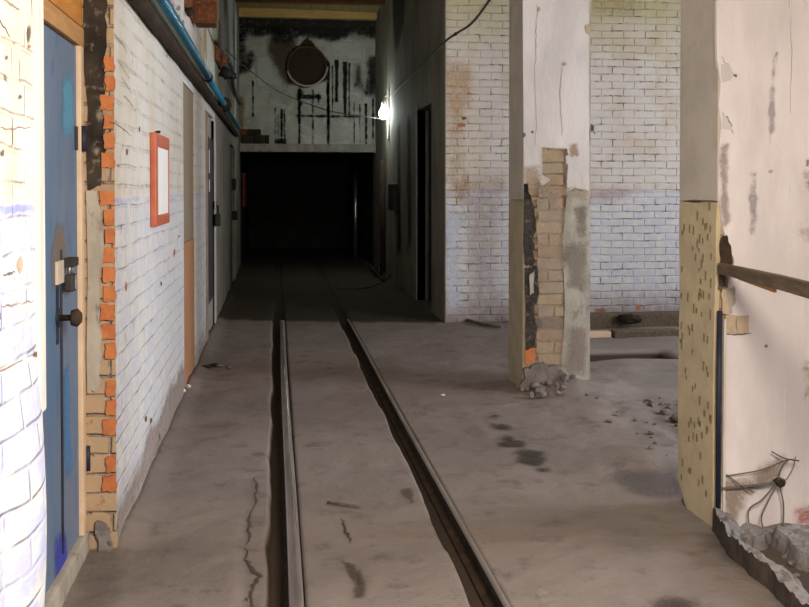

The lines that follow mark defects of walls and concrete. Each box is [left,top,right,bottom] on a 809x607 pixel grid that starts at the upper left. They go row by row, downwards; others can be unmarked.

damp [239,17,375,74]
spalling [100,55,140,168]
damp [274,108,286,144]
damp [296,56,375,144]
spalling [99,191,117,359]
flaking render [523,144,578,370]
spalling [720,235,733,264]
flaking render [718,274,751,335]
spalling [102,380,117,435]
spalling [102,455,118,492]
crack [244,477,263,607]
damp [658,598,691,607]